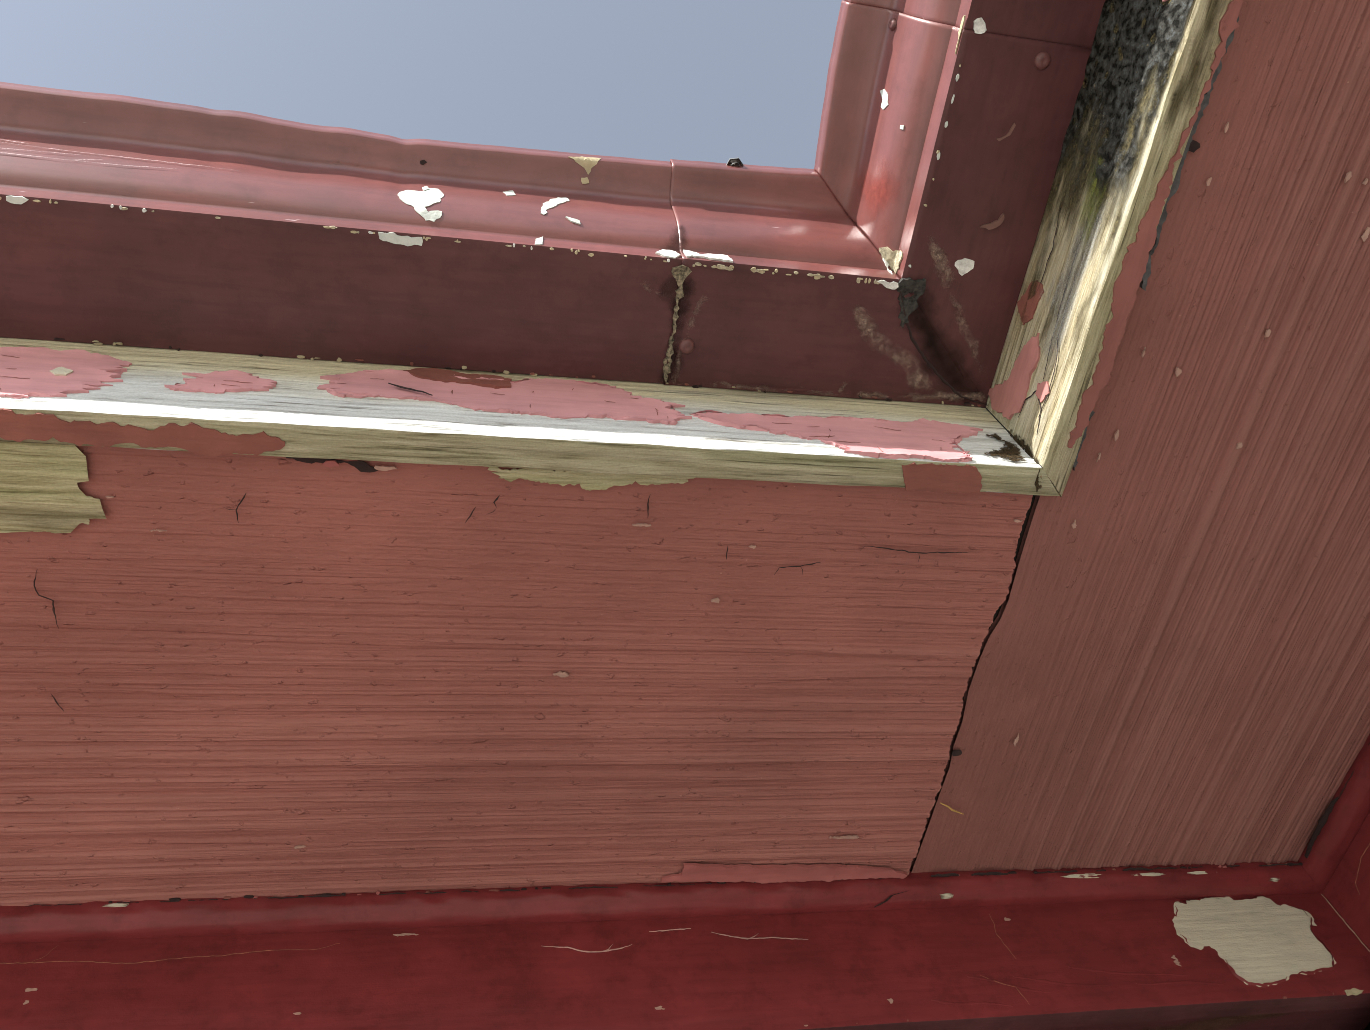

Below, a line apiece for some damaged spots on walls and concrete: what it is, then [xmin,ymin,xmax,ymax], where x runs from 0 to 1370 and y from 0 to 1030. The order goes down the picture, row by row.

peeling [323,186,444,246]
damp [1028,0,1219,332]
peeling [1067,0,1243,448]
peeling [964,281,1050,420]
peeling [0,338,285,533]
peeling [317,358,983,493]
peeling [1034,868,1116,878]
peeling [1171,863,1336,999]